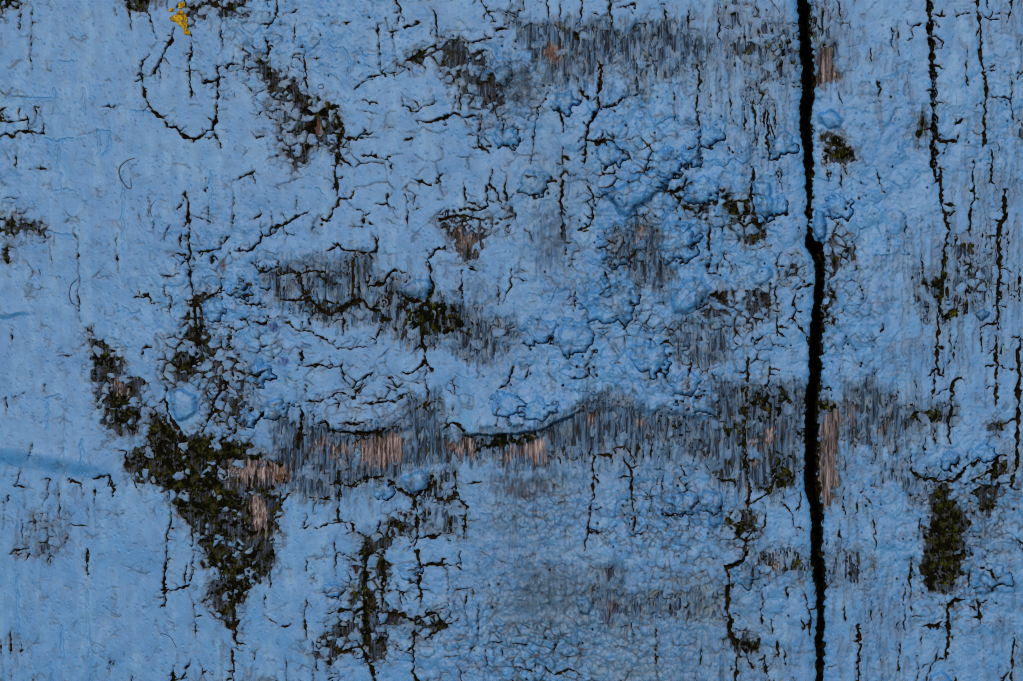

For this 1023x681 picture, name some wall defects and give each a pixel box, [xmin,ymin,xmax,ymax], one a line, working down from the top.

peeling [242,48,346,171]
peeling [396,35,509,131]
peeling [509,16,712,96]
crack [33,221,97,357]
peeling [270,255,518,363]
crack [115,0,893,681]
crack [871,0,1023,498]
crack [3,450,143,576]
peeling [89,285,813,669]
peeling [817,379,1019,595]
crack [843,507,1015,681]
crack [1001,633,1018,681]